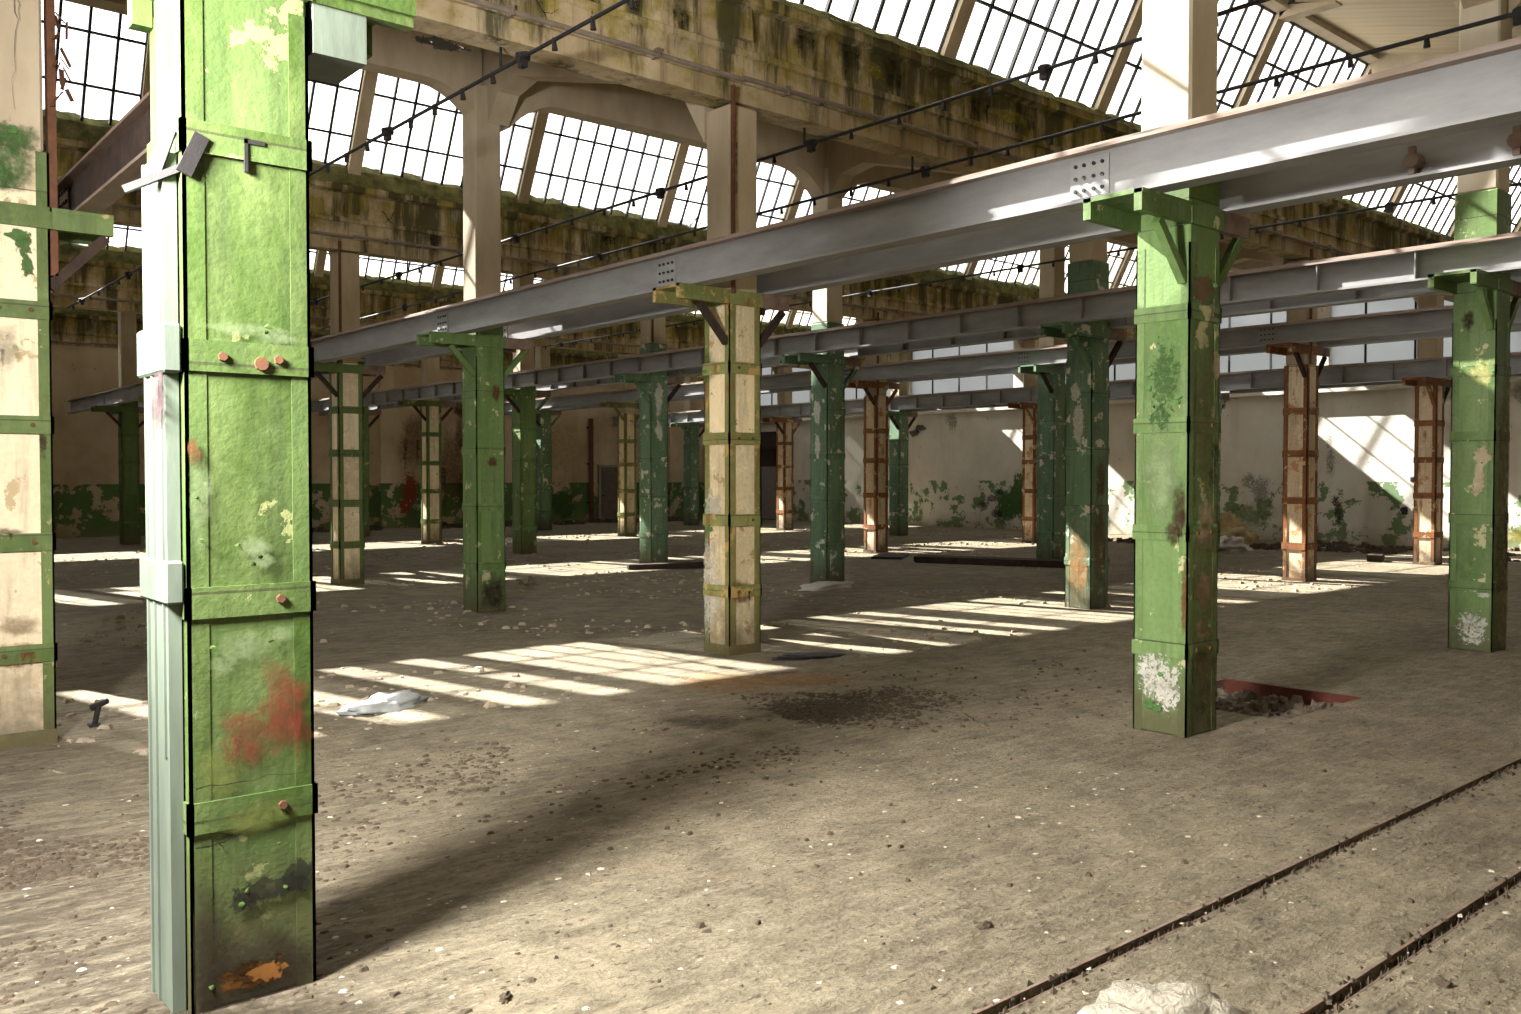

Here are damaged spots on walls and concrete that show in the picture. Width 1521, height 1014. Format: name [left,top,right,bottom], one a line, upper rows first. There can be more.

damp [674,0,689,30]
damp [795,28,814,53]
peeling [1212,350,1220,381]
peeling [978,470,1022,527]
peeling [1144,441,1175,516]
peeling [1325,433,1344,528]
peeling [1453,593,1490,648]
peeling [1136,653,1181,712]